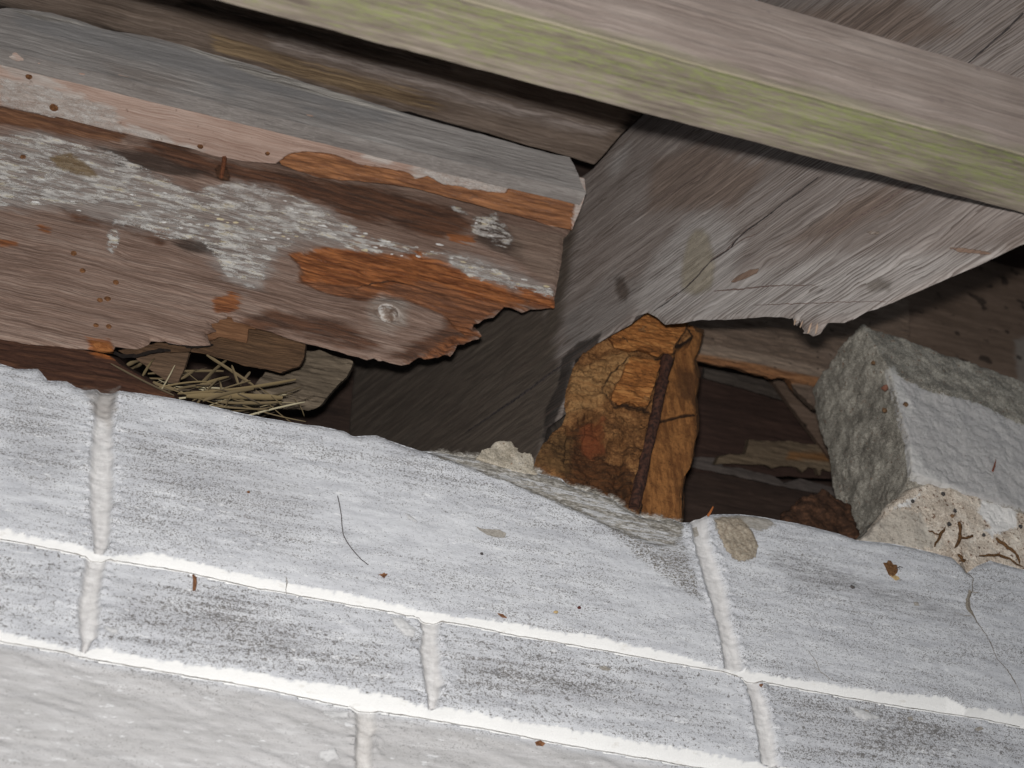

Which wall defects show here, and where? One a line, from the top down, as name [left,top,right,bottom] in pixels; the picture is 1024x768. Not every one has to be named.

peeling [0,134,554,295]
crack [0,539,1024,727]